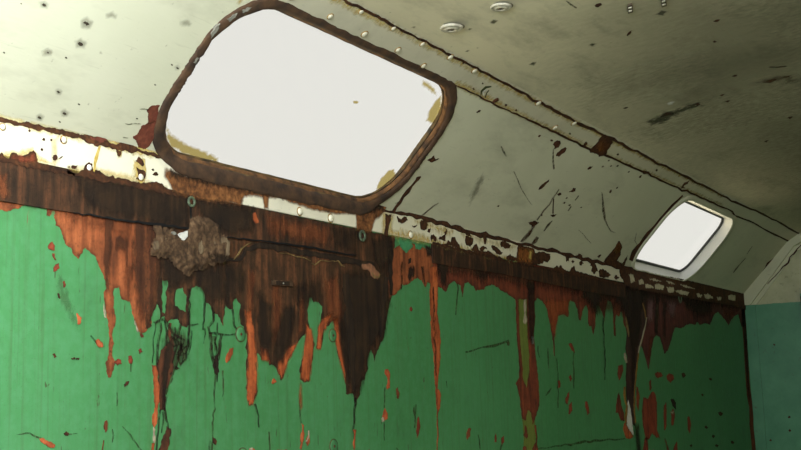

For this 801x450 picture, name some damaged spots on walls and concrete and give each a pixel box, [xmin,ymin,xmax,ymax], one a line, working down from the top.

water stain [648,103,700,124]
peeling [0,201,25,211]
peeling [46,209,188,387]
corrosion [68,83,789,450]
peeling [361,238,628,450]